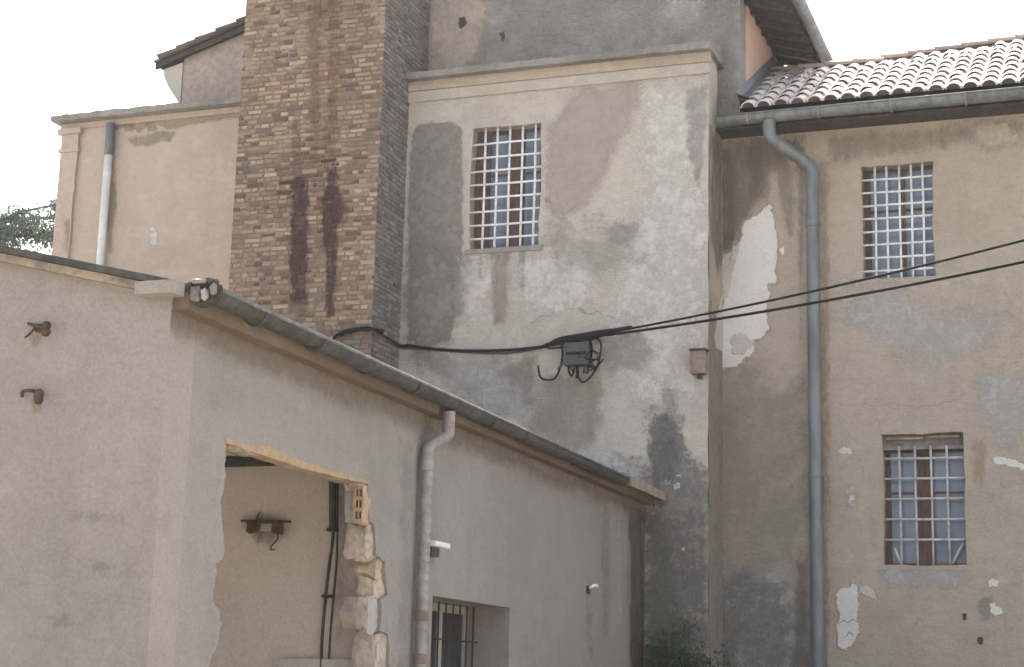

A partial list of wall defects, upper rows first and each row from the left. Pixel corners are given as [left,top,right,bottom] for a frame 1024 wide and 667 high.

damp [404,123,466,365]
peeling [714,201,784,371]
spalling [225,437,387,667]
damp [598,301,807,667]
peeling [834,581,877,652]
flaking render [989,602,1003,616]
peeling [993,457,1024,471]